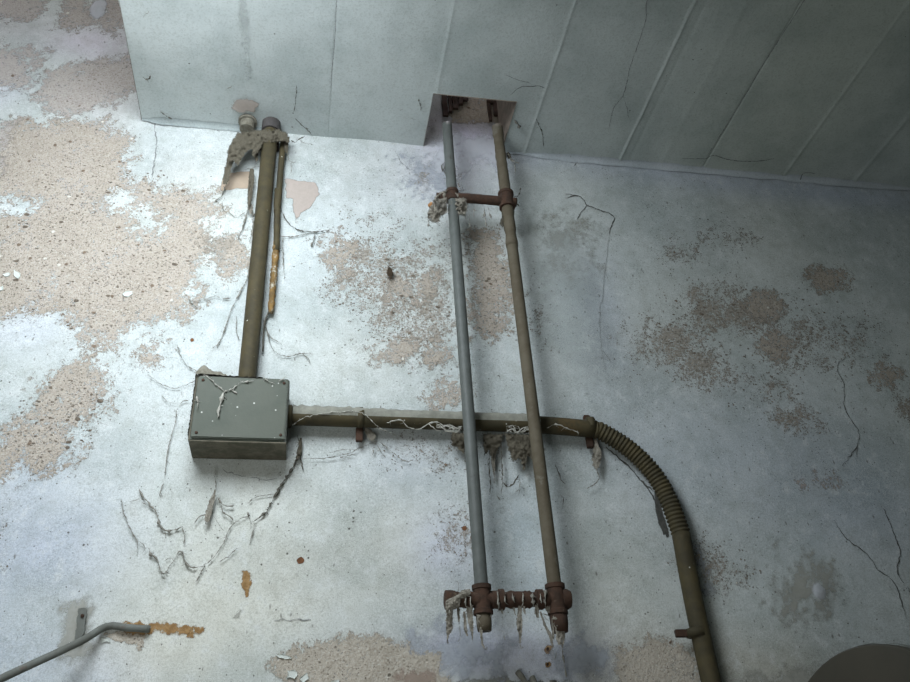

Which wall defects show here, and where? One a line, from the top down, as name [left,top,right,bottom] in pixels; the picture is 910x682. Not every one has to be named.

flaking render [0,0,123,39]
crack [330,0,338,85]
flaking render [0,39,250,488]
flaking render [299,197,462,411]
flaking render [462,223,517,365]
flaking render [608,219,910,445]
corrosion [241,570,252,597]
crack [834,511,910,611]
corrosion [124,620,204,638]
peeling [265,631,451,682]
peeling [613,632,700,682]